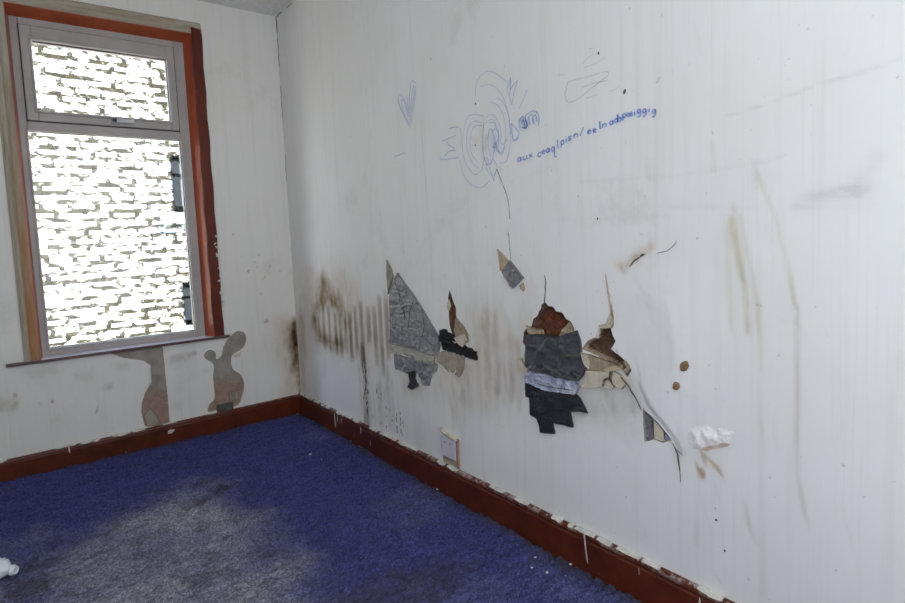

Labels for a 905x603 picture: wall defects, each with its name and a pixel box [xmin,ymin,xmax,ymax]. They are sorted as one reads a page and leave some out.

spalling [447,291,469,344]
spalling [523,303,574,345]
peeling [111,347,177,437]
peeling [204,331,246,415]
peeling [436,350,465,377]
spalling [580,311,631,389]
crack [603,371,641,410]
spalling [643,409,672,443]
crack [670,442,681,482]